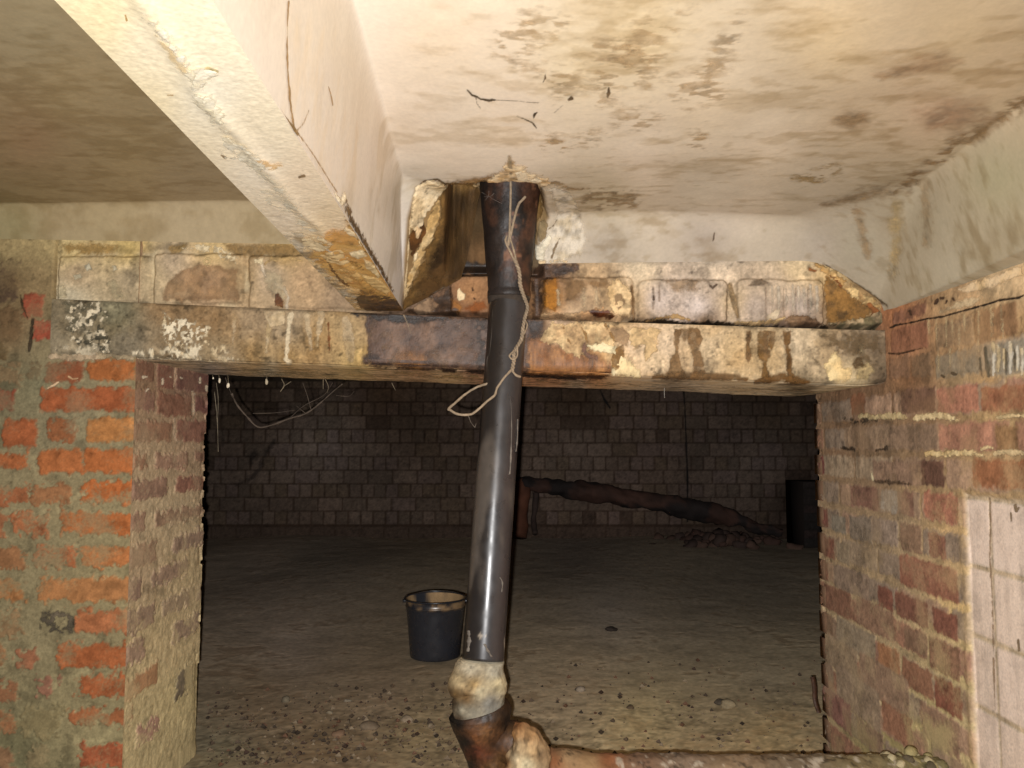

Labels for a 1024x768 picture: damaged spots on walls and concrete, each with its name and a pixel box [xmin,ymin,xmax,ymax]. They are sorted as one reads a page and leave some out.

crack [285,1,337,192]
damp [895,99,1024,192]
damp [66,243,113,255]
spalling [290,156,585,314]
damp [63,301,111,356]
damp [132,244,330,365]
rust [526,321,612,381]
crack [889,295,1024,328]